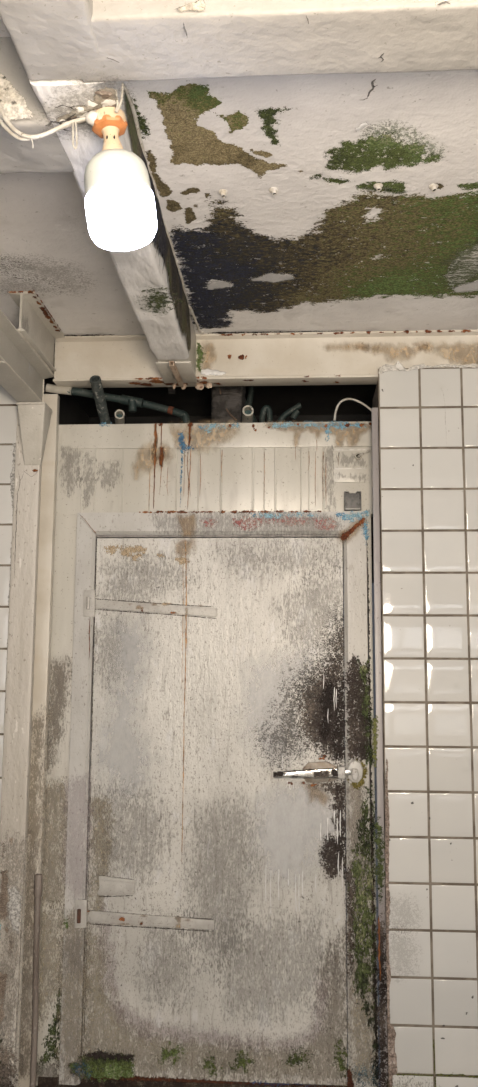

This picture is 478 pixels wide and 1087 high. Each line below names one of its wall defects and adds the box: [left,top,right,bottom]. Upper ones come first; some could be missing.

peeling [145,83,287,224]
damp [124,90,478,354]
corrosion [139,406,321,514]
corrosion [340,518,365,541]
damp [47,662,72,771]
mould [256,604,374,771]
damp [38,779,348,1087]
mould [0,1039,19,1087]